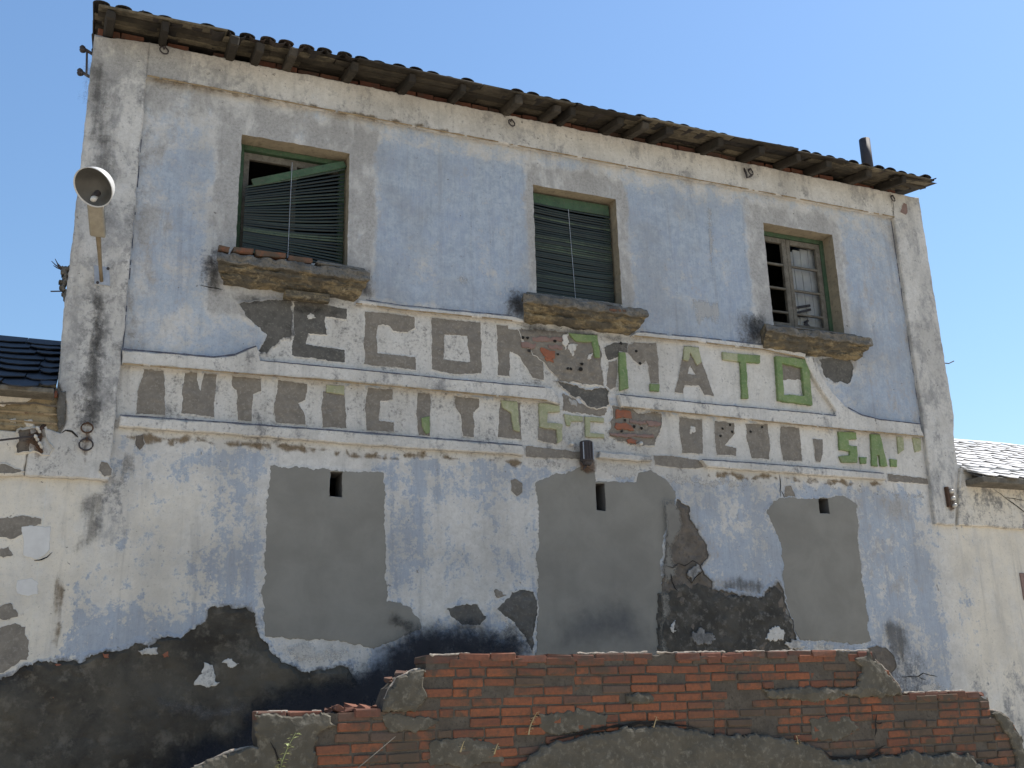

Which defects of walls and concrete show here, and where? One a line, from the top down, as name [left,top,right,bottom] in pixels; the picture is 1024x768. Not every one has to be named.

spalling [0,426,54,476]
leakage [87,300,102,423]
spalling [518,327,704,469]
spalling [816,356,855,387]
peeling [0,515,42,558]
spalling [443,586,539,654]
spalling [656,497,849,655]
spalling [0,600,360,768]
leakage [166,618,530,768]